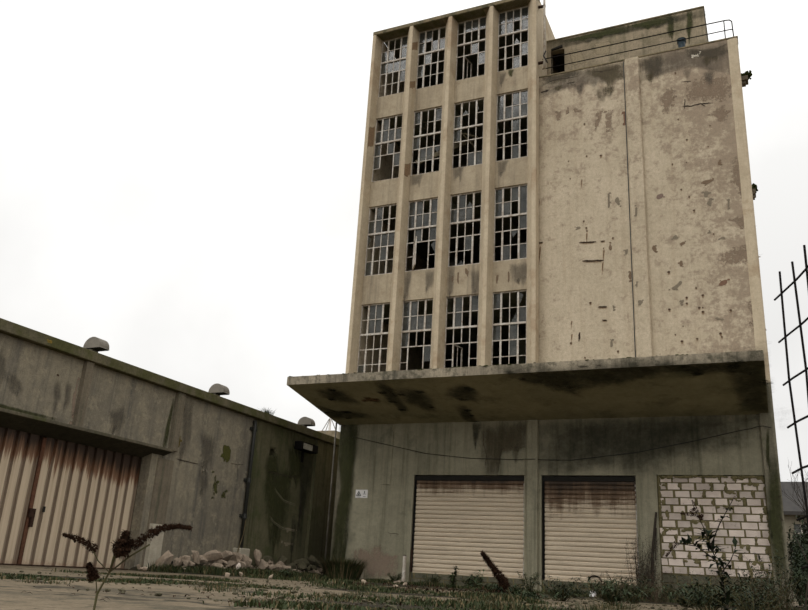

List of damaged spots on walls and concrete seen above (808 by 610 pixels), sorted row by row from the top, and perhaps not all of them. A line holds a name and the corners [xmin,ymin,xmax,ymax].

water stain [565,12,724,64]
water stain [592,65,622,98]
water stain [644,57,661,80]
spalling [701,178,714,206]
peeling [730,161,742,195]
peeling [718,245,747,264]
water stain [379,385,433,410]
water stain [507,356,772,409]
water stain [454,387,525,472]
water stain [558,419,724,466]
water stain [266,448,310,554]